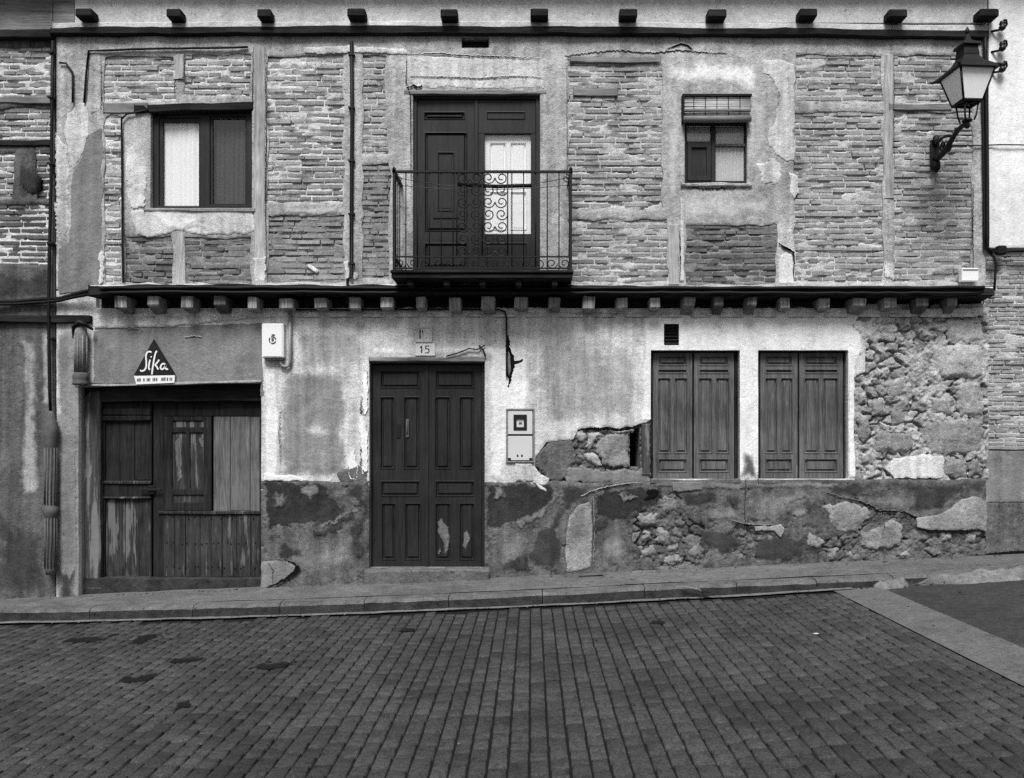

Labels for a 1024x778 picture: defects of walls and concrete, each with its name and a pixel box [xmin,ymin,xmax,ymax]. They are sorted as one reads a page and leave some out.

peeling [756,59,799,198]
crack [778,242,796,284]
peeling [438,518,449,554]
spalling [486,424,987,572]
crack [827,492,919,538]